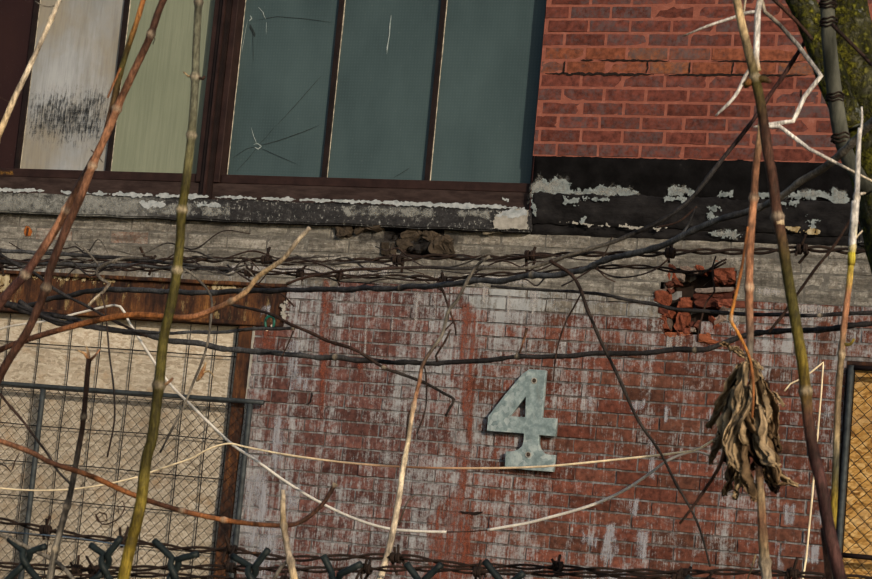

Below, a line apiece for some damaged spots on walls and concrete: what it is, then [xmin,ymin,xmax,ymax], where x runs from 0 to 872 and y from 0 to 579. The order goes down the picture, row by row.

crack [545,59,806,97]
peeling [663,184,695,203]
peeling [706,190,733,220]
peeling [781,187,850,207]
spalling [81,176,639,259]
peeling [566,216,667,232]
peeling [708,229,743,239]
peeling [785,214,821,235]
spalling [653,260,742,344]